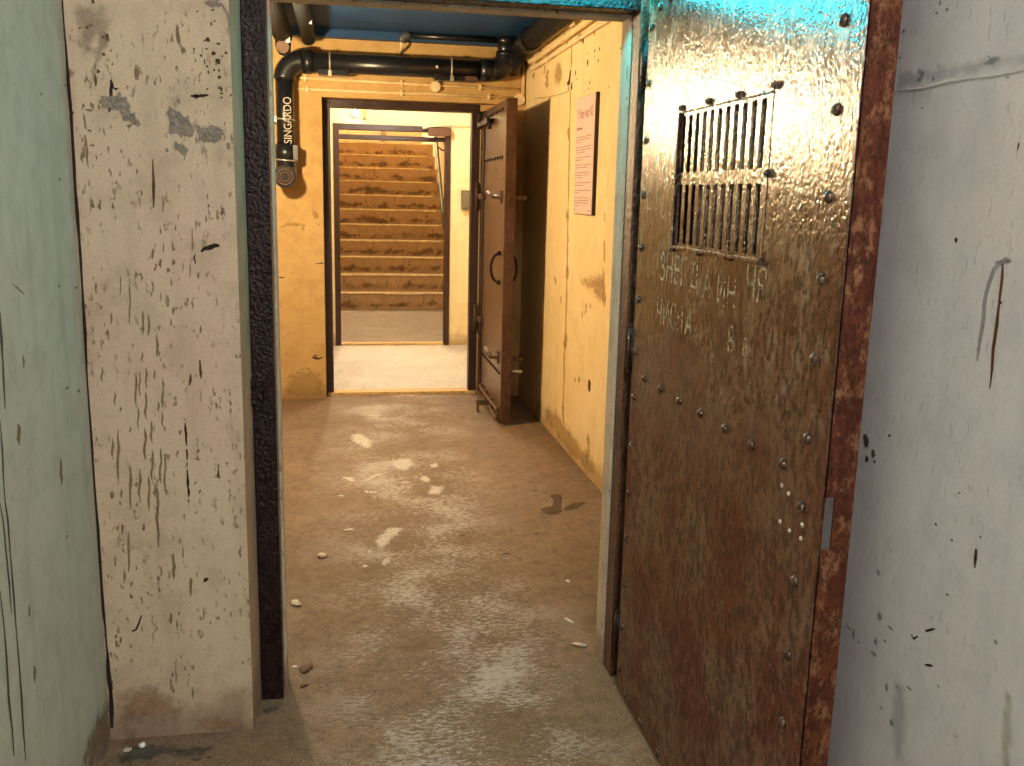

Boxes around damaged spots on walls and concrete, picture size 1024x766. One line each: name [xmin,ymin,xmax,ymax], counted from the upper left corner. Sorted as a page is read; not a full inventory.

spalling [83,93,140,167]
spalling [165,99,234,156]
damp [546,410,594,472]
damp [533,490,585,515]